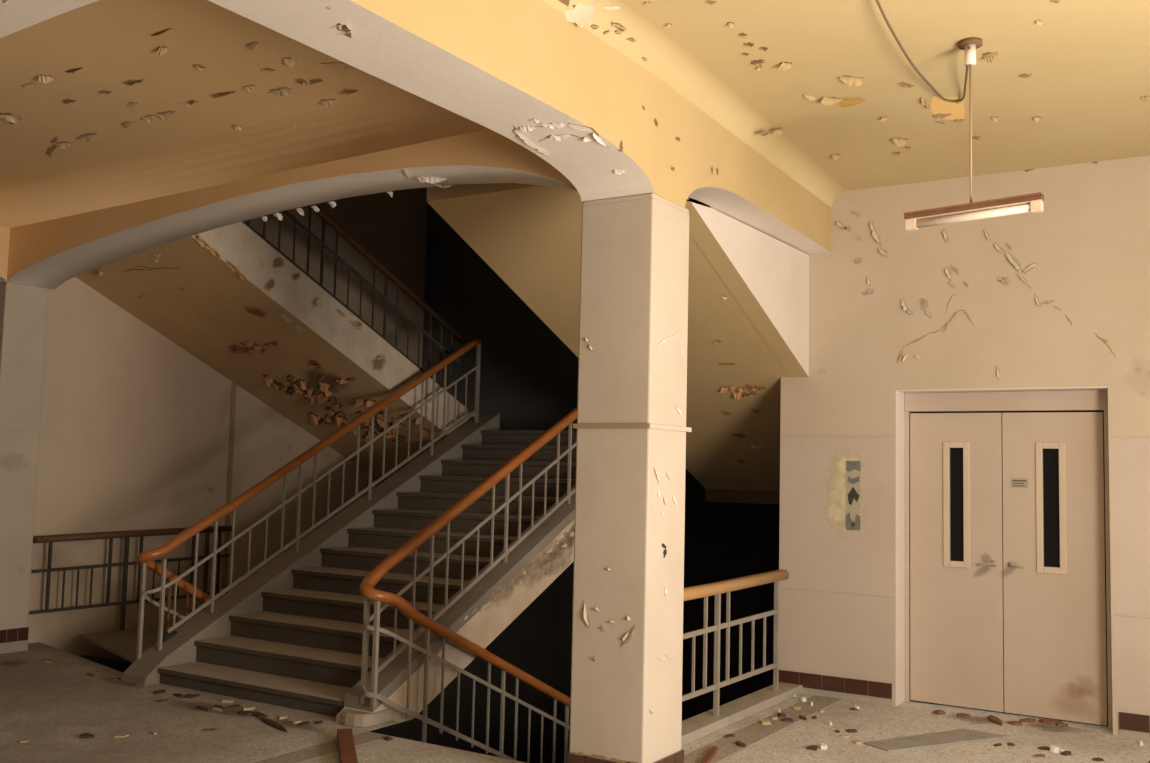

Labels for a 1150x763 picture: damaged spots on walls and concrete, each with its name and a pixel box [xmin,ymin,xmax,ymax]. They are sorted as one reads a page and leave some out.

peeling [22,67,84,89]
peeling [99,79,144,96]
peeling [210,57,324,99]
peeling [320,62,353,70]
peeling [727,22,768,71]
peeling [898,82,965,124]
peeling [512,119,623,156]
peeling [983,229,1061,311]
crack [896,293,975,363]
crack [1065,315,1116,359]
peeling [262,359,430,447]
peeling [583,600,637,648]